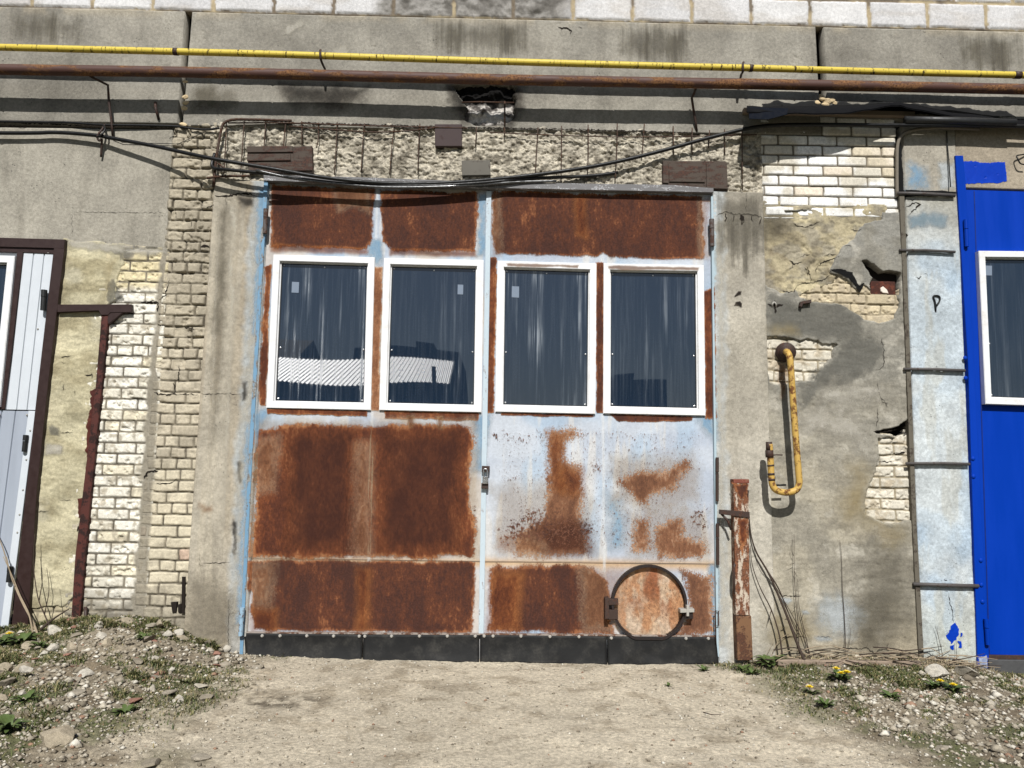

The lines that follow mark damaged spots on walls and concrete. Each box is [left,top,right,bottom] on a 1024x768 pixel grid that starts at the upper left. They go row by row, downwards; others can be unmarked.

spalling [206,86,899,323]
rust [247,184,717,635]
spalling [767,337,835,385]
crack [874,338,906,463]
rust [732,483,749,503]
rust [737,518,748,555]
spalling [865,429,910,524]